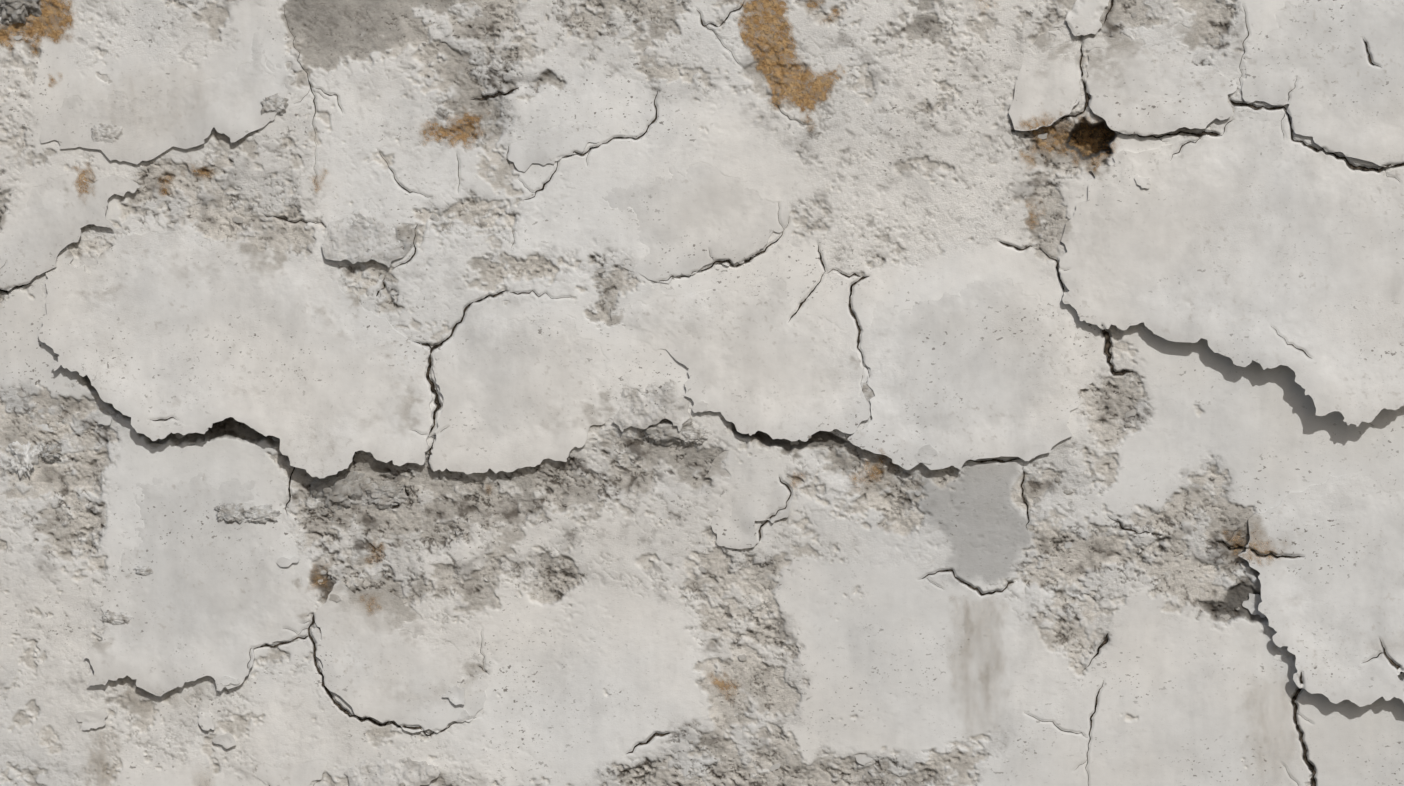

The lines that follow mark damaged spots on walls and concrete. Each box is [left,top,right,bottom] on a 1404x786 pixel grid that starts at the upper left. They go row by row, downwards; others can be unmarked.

rust [0,0,73,53]
flaking render [283,0,683,148]
crack [507,91,658,200]
rust [738,0,839,119]
peeling [0,23,730,733]
crack [414,290,570,461]
crack [789,246,870,391]
peeling [588,0,1404,537]
crack [247,615,476,736]
flaking render [592,477,940,786]
peeling [1015,455,1404,707]
crack [1286,672,1316,786]